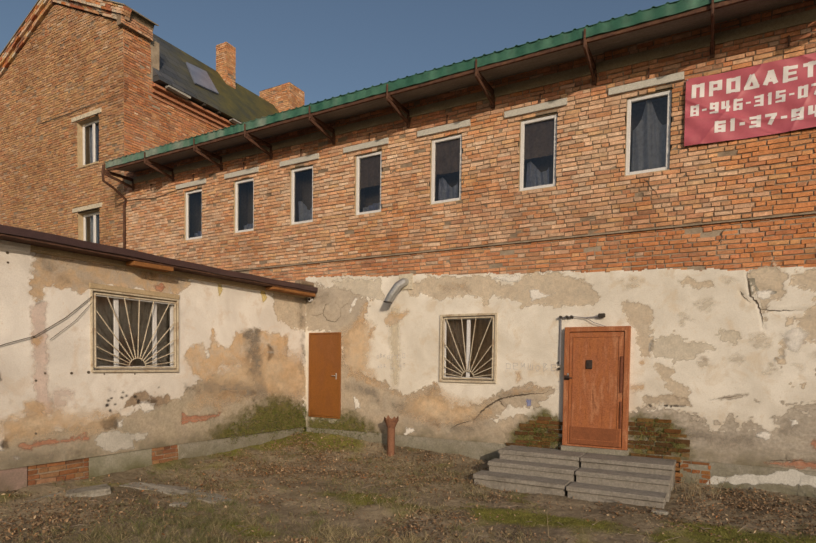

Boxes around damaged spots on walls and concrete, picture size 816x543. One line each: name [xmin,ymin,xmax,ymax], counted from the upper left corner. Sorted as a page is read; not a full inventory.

flaking render [29,253,191,302]
flaking render [272,293,306,332]
crack [741,272,794,326]
flaking render [0,329,304,470]
crack [452,391,548,428]
flaking render [621,302,816,488]